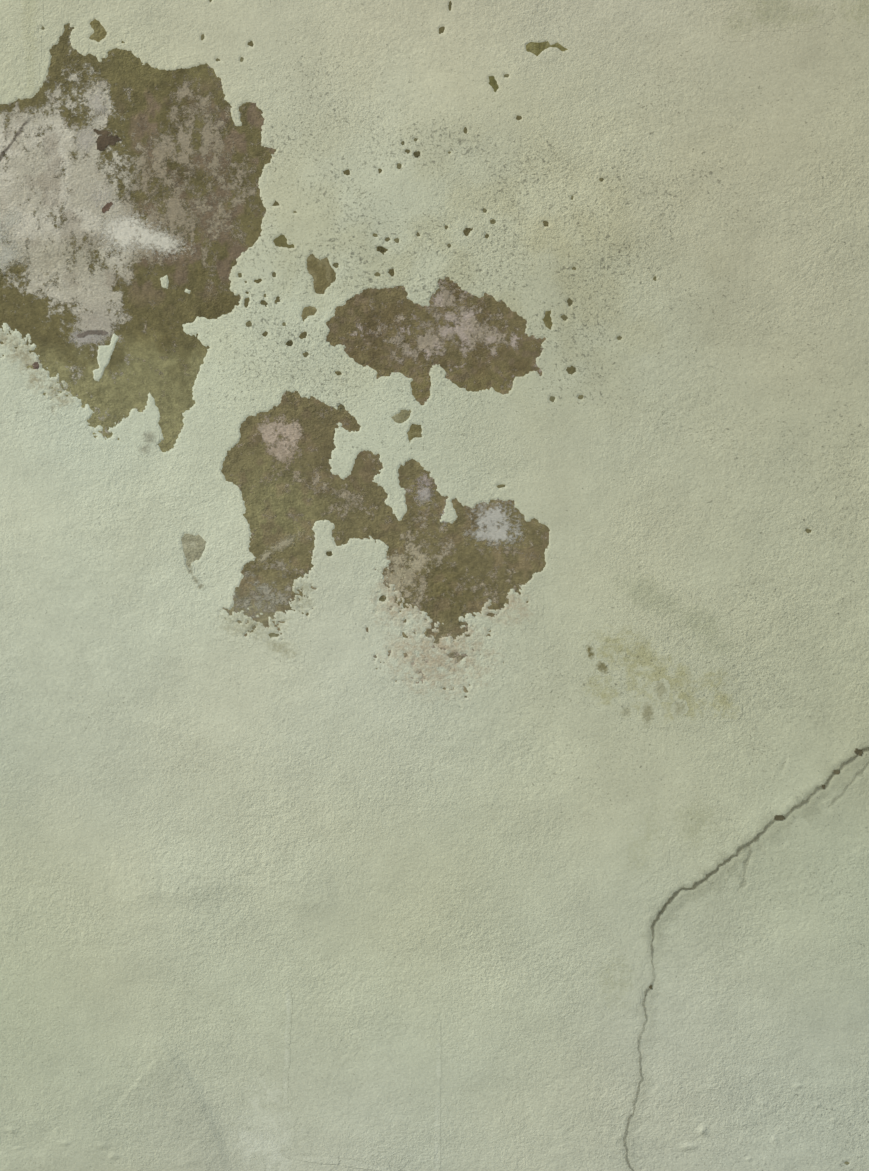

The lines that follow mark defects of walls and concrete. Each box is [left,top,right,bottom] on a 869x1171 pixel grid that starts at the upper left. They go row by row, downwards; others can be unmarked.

peeling [526,41,568,56]
peeling [489,74,509,92]
peeling [0,19,294,457]
spalling [373,233,399,255]
spalling [463,208,496,238]
peeling [286,254,573,442]
peeling [206,391,550,710]
crack [822,748,869,789]
crack [652,815,785,928]